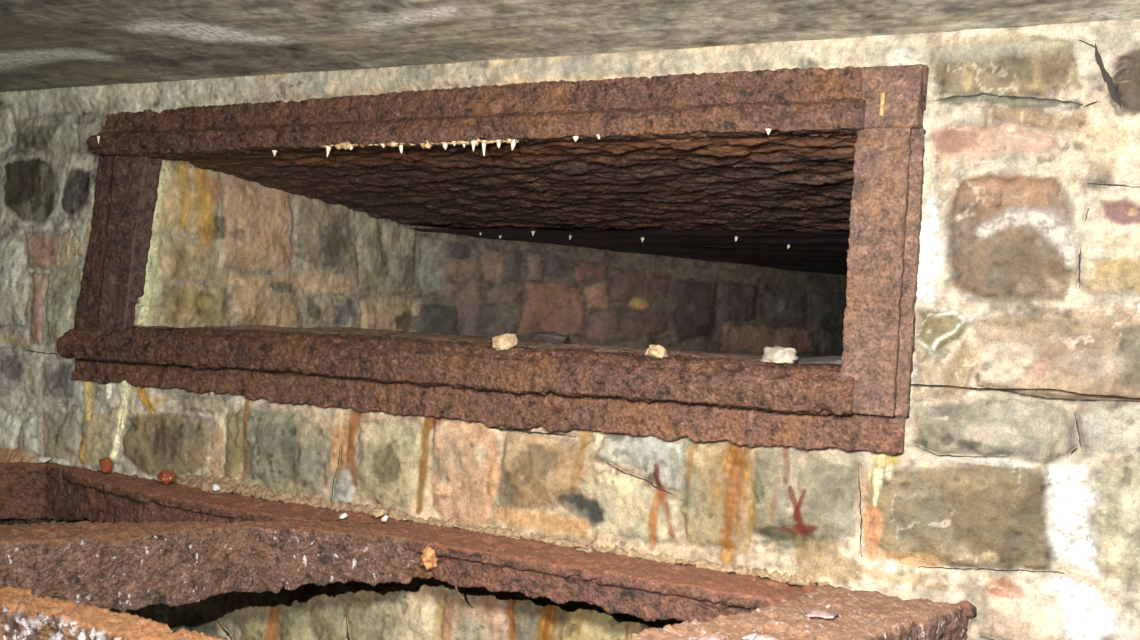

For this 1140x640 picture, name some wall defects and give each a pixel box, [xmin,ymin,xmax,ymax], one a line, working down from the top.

crack [935,40,1121,107]
corrosion [347,410,360,485]
corrosion [417,417,435,513]
corrosion [649,464,674,544]
corrosion [715,443,753,564]
corrosion [782,446,816,535]
leakage [1047,465,1139,640]
corrosion [539,598,557,640]
corrosion [805,609,839,619]